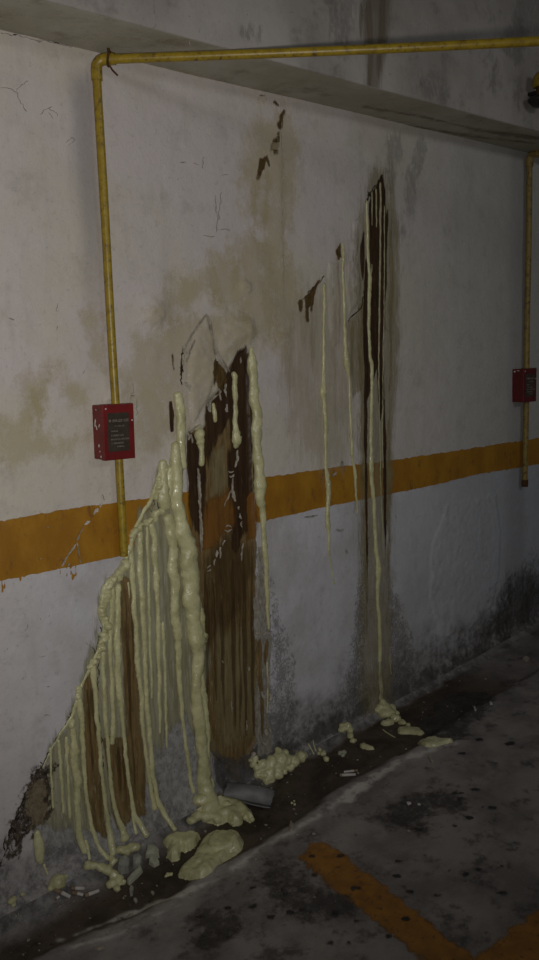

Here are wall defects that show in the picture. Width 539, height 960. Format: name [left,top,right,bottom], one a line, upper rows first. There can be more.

corrosion [213,359,227,391]
corrosion [360,175,388,573]
damp [33,182,539,892]
spalling [25,712,199,859]
corrosion [83,576,146,839]
corrosion [254,632,273,757]